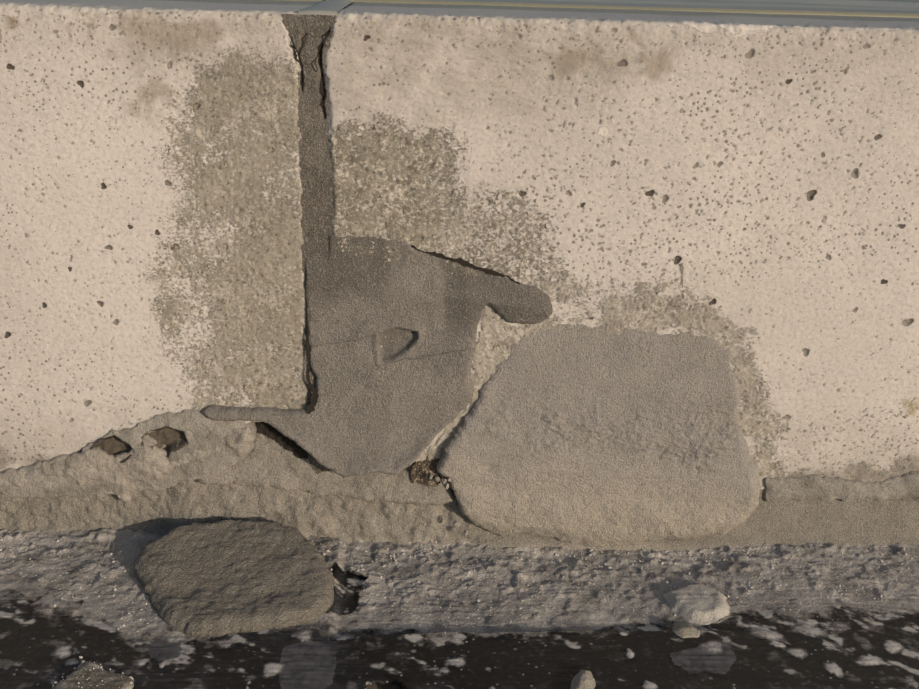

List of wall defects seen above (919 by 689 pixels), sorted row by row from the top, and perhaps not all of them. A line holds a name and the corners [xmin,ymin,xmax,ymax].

crack [289,30,330,118]
crack [411,245,521,284]
crack [305,324,319,414]